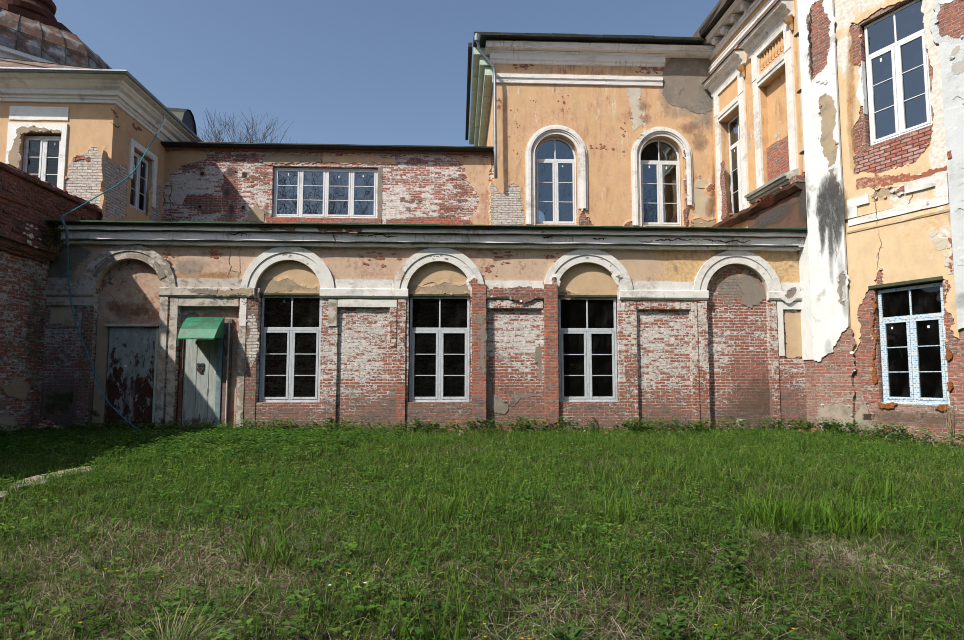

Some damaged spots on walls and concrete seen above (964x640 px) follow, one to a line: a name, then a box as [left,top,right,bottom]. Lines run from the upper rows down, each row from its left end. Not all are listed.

flaking render [795,0,836,84]
flaking render [929,0,964,75]
flaking render [64,144,130,221]
flaking render [147,150,208,222]
spalling [183,152,438,223]
flaking render [369,156,526,226]
water stain [756,175,848,257]
flaking render [851,118,952,202]
flaking render [710,264,766,308]
flaking render [779,282,802,359]
flaking render [477,313,542,414]